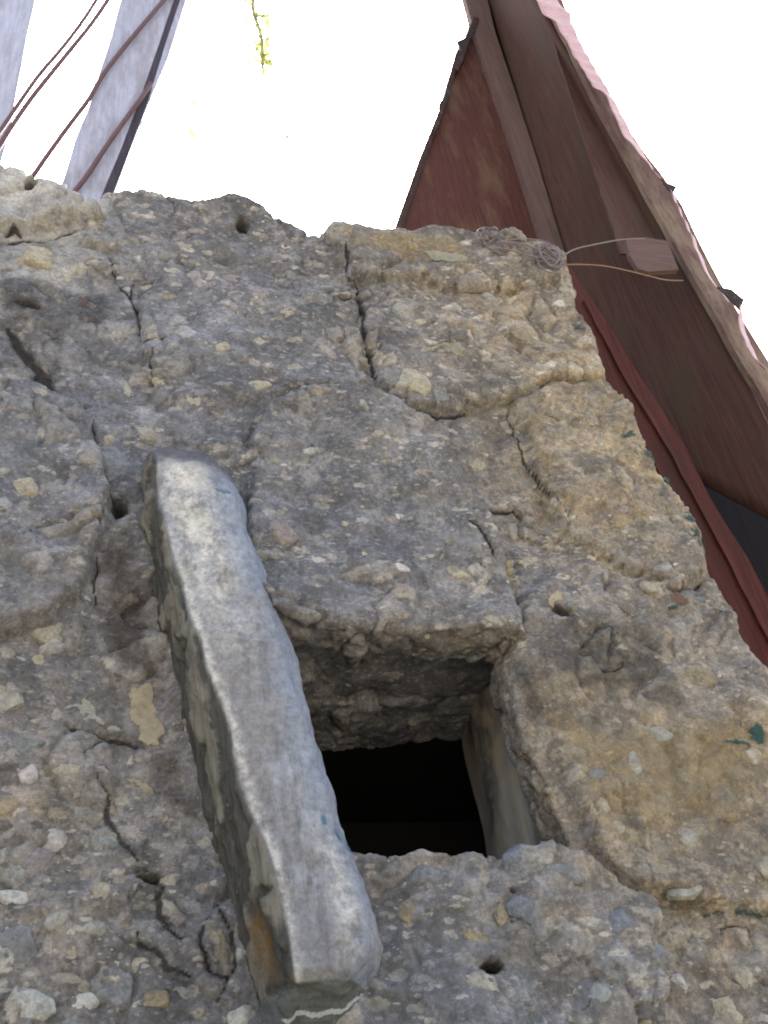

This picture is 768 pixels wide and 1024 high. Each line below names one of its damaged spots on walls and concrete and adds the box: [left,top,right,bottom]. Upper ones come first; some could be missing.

crack [6,329,56,392]
crack [109,258,163,386]
crack [342,244,377,381]
crack [506,410,569,516]
crack [90,558,98,606]
crack [98,778,138,861]
crack [136,887,237,1002]